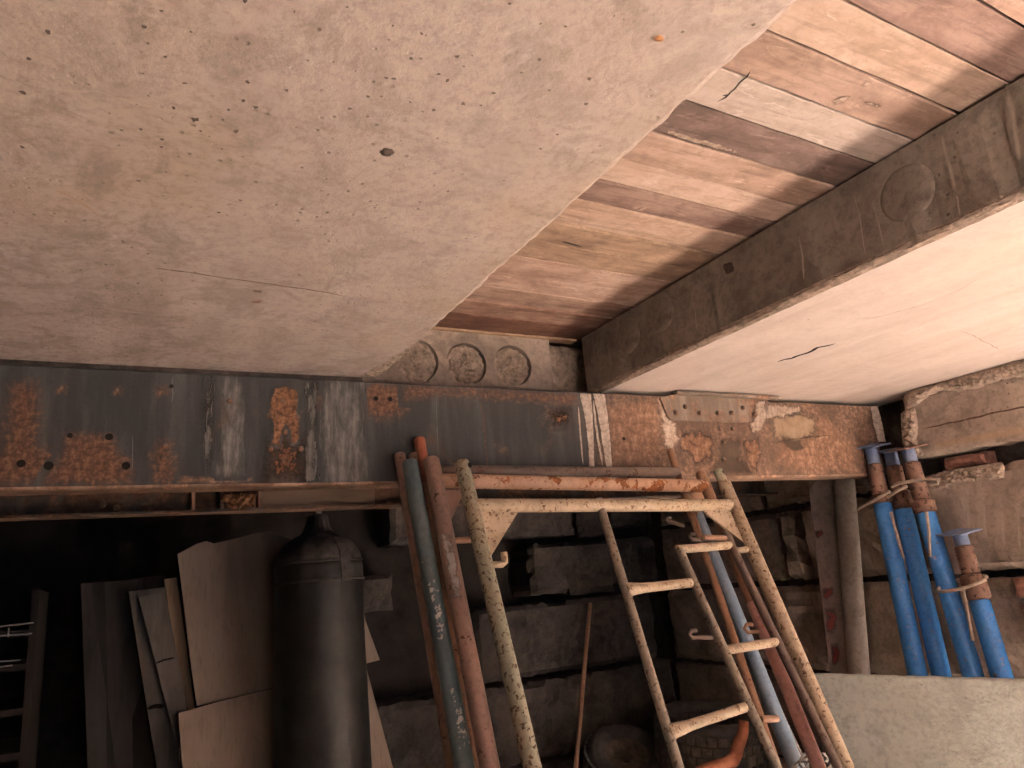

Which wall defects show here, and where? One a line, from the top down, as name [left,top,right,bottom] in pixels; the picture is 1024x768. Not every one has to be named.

crack [719,71,751,101]
crack [157,268,433,306]
crack [728,343,841,393]
rust [0,372,140,487]
rust [597,394,667,467]
peeling [750,399,816,441]
rust [743,407,865,475]